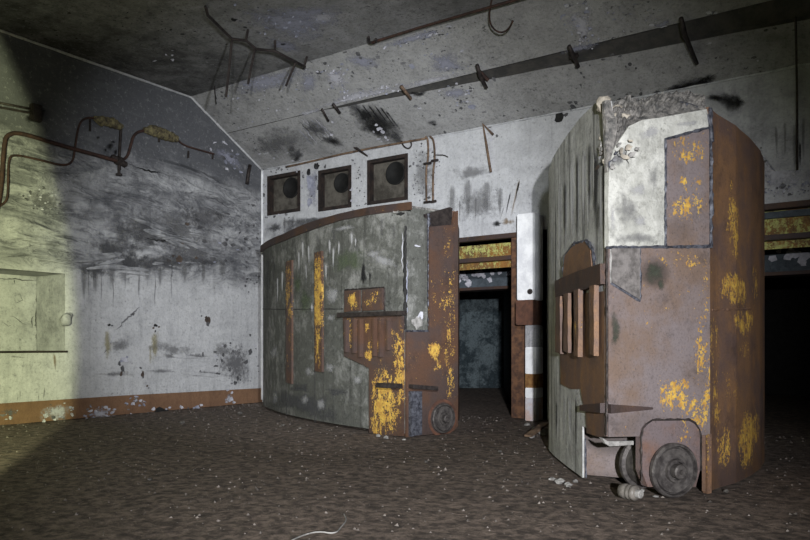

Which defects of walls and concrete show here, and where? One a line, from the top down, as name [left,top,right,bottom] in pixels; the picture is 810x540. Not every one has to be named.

spalling [594,90,706,173]
water stain [121,256,212,268]